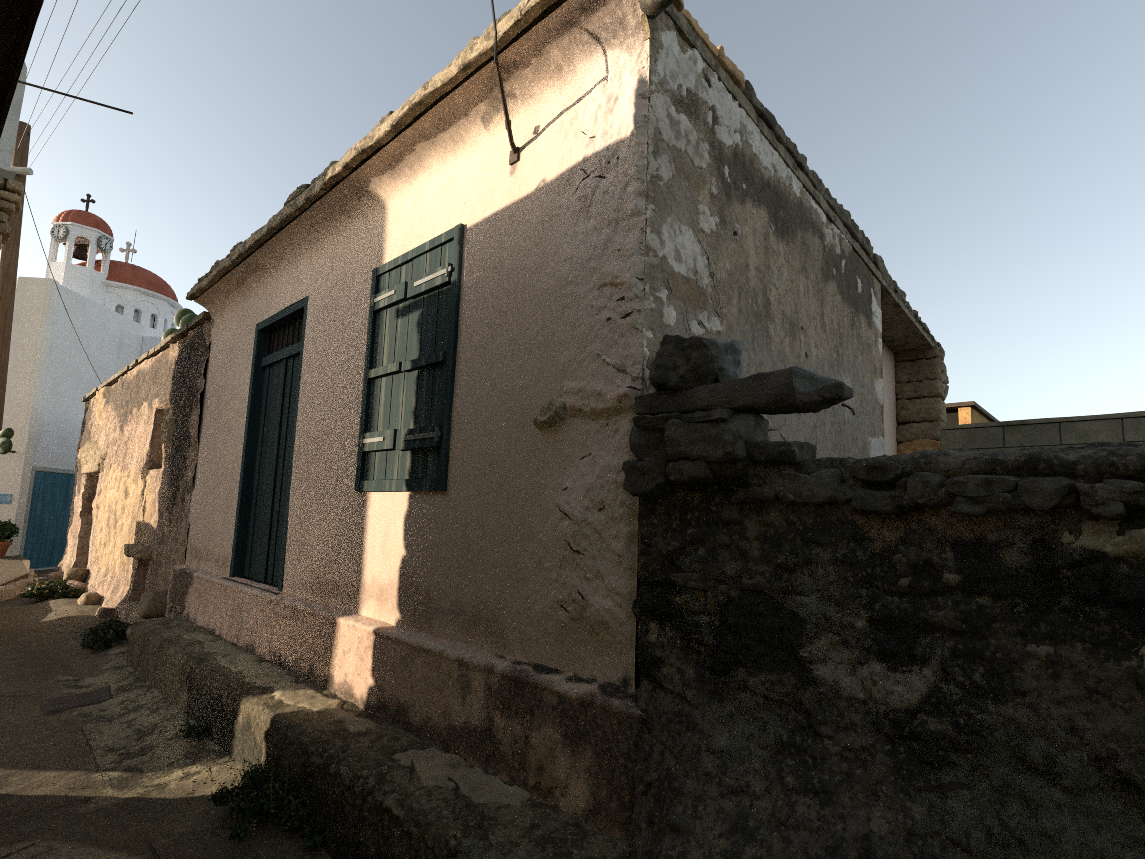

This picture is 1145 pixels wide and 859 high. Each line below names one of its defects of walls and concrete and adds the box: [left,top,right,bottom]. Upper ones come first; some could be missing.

water stain [645,259,706,347]
flaking render [597,30,882,395]
water stain [653,129,875,326]
flaking render [868,436,886,457]
water stain [168,568,195,621]
water stain [237,641,648,839]